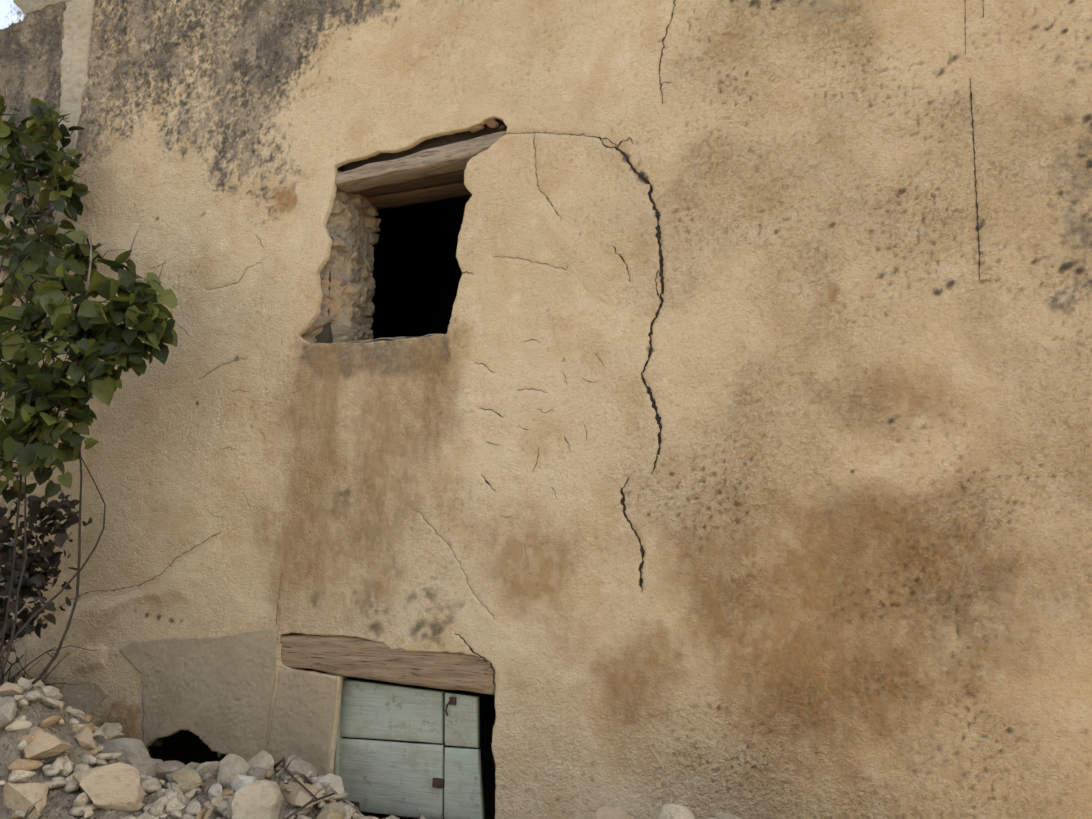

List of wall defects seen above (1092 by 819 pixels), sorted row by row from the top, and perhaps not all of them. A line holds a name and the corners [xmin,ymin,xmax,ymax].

crack [659,0,675,104]
crack [965,0,984,279]
damp [308,394,411,590]
damp [305,336,449,475]
crack [508,132,664,591]